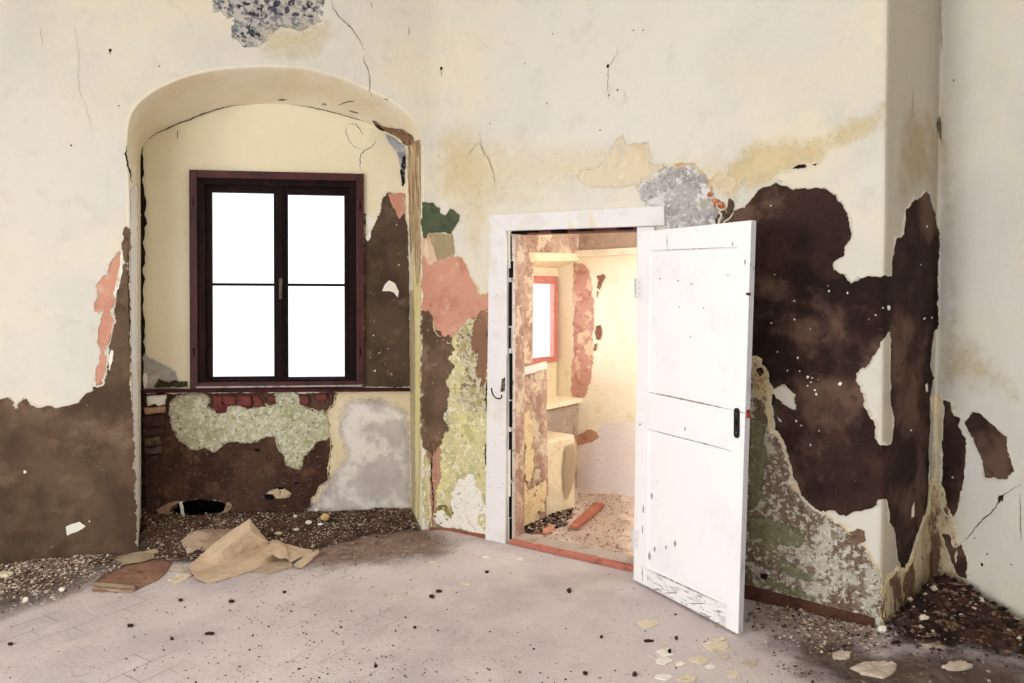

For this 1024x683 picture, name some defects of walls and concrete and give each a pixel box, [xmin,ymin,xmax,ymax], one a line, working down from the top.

crack [280,1,386,169]
damp [454,142,499,184]
damp [729,142,822,187]
flaking render [0,121,488,573]
peeling [546,263,605,446]
flaking render [578,135,1015,625]
crack [963,485,1022,542]